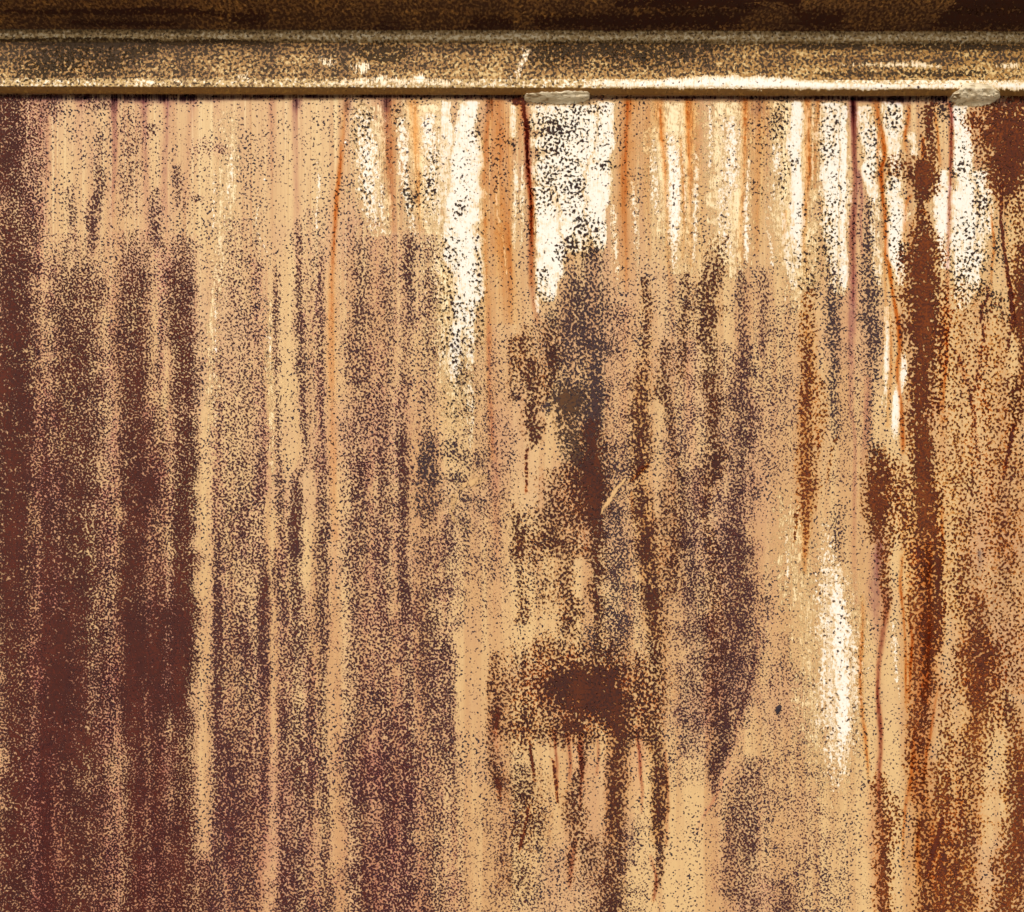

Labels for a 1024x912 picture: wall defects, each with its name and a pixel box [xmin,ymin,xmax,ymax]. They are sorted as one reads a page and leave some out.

corrosion [3,6,267,28]
corrosion [0,37,287,85]
corrosion [349,13,415,63]
corrosion [508,0,1024,72]
corrosion [817,68,986,78]
corrosion [172,165,201,210]
corrosion [863,771,904,912]